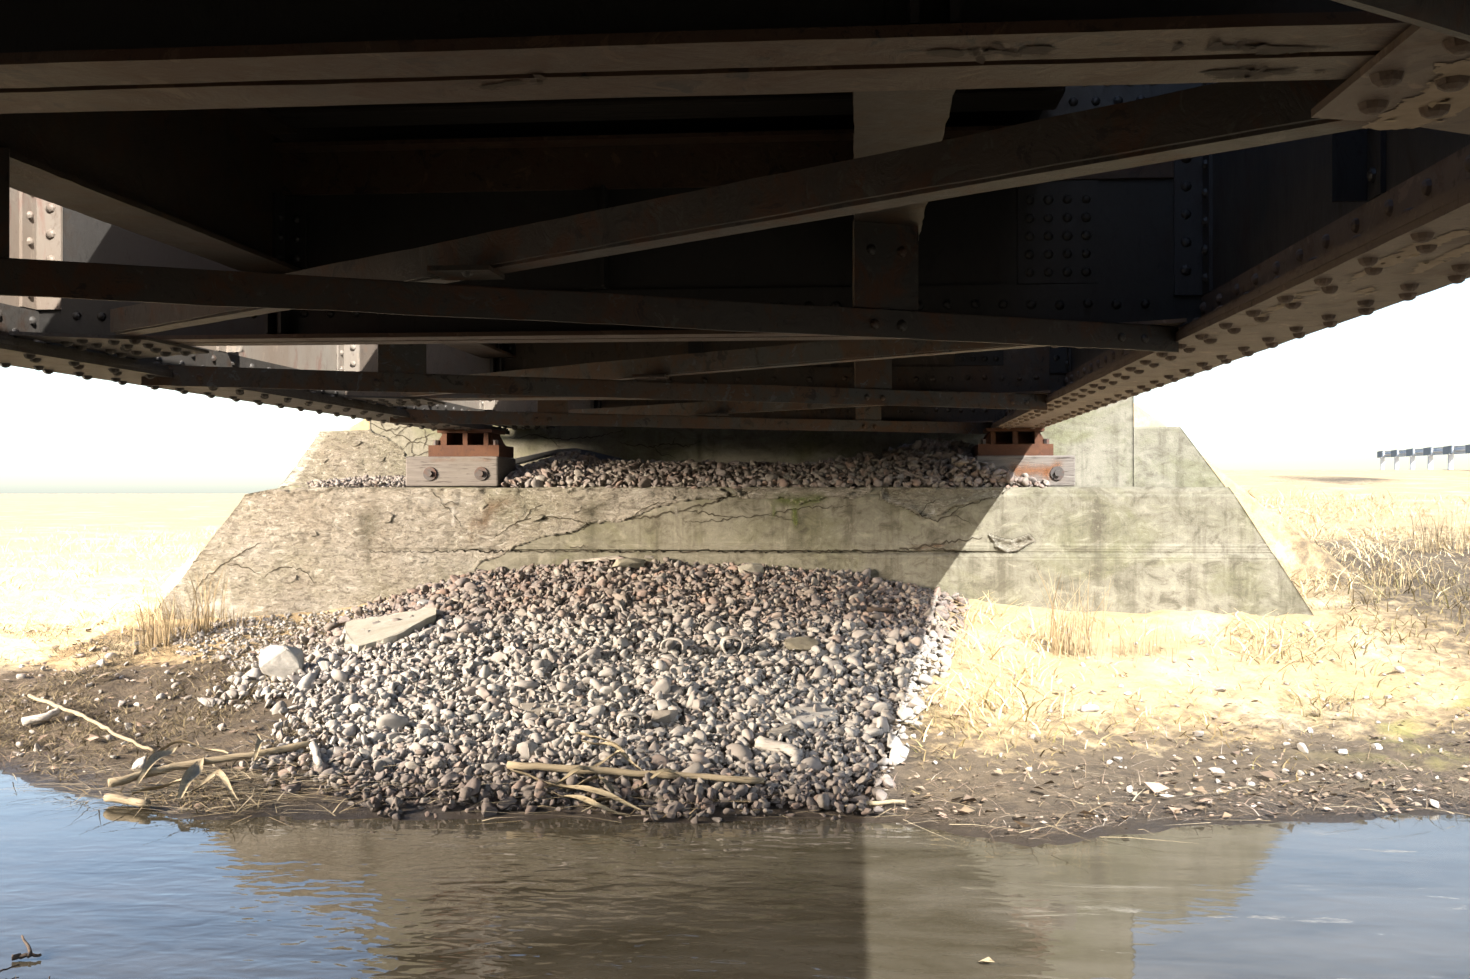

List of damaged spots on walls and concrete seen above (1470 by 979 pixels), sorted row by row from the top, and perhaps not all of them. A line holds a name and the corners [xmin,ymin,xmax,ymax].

crack [368,422,434,459]
crack [369,489,995,554]